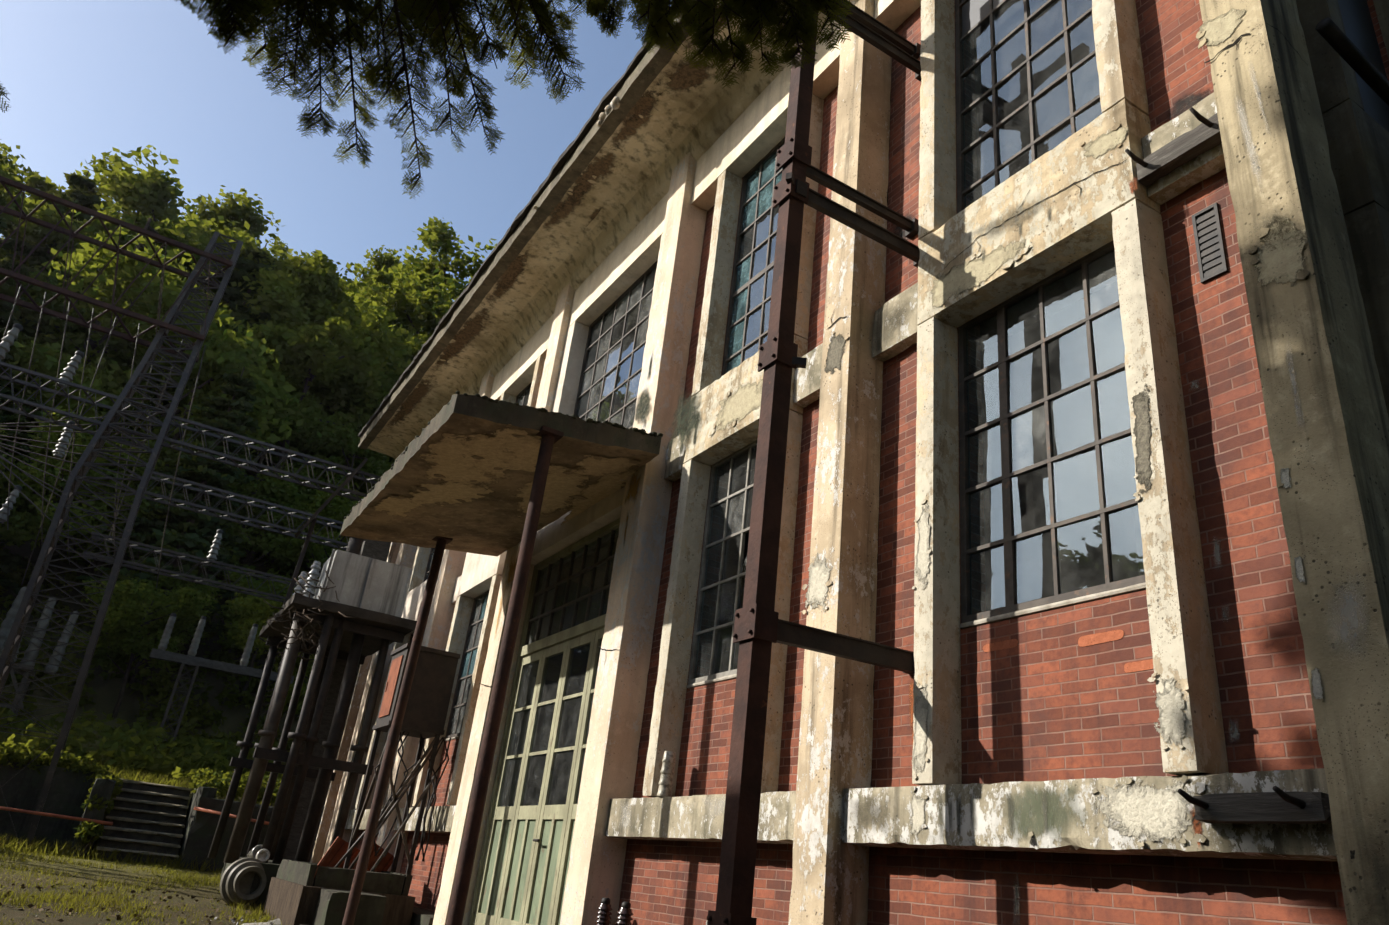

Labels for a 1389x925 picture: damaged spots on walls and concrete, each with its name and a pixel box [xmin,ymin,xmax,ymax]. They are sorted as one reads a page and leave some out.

peeling [1196,8,1245,49]
crack [945,159,1127,268]
water stain [939,799,975,831]